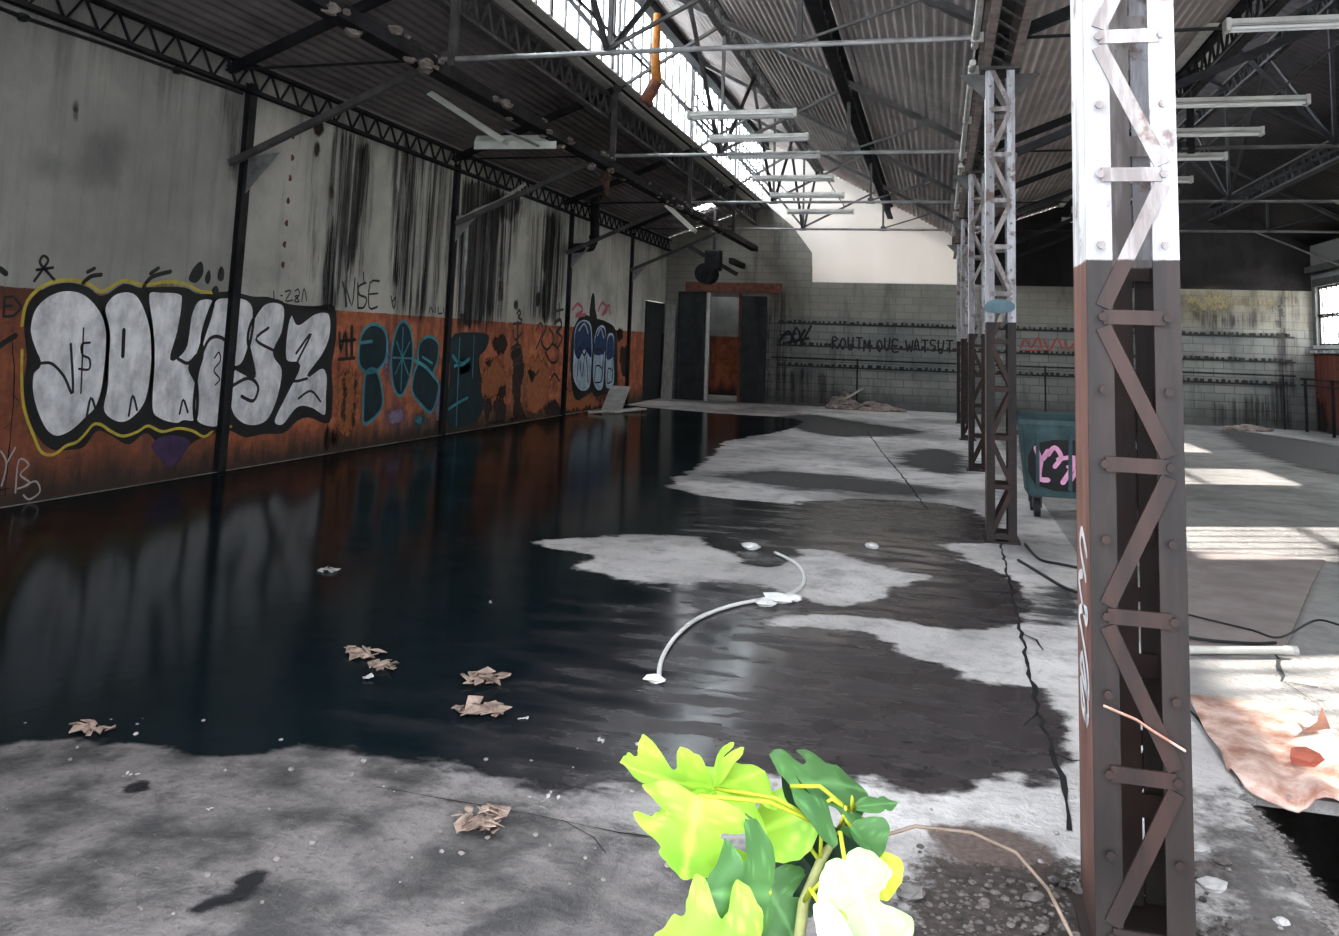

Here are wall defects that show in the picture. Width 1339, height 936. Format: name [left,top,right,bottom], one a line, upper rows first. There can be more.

leakage [313,123,370,313]
leakage [391,140,565,330]
crack [996,543,1078,831]
leakage [1022,587,1078,626]